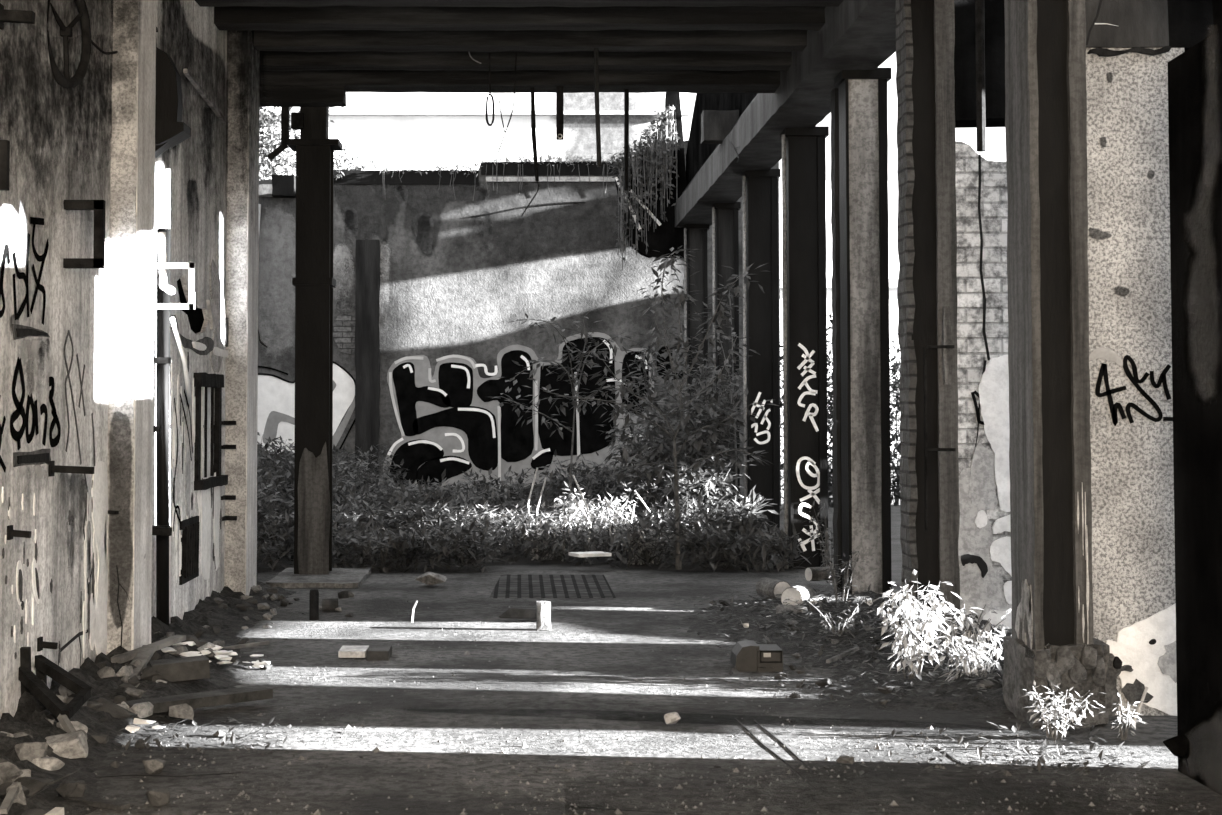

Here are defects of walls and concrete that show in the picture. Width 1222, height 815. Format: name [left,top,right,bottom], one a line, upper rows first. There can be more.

peeling [1077,485,1089,644]
peeling [1105,603,1177,716]